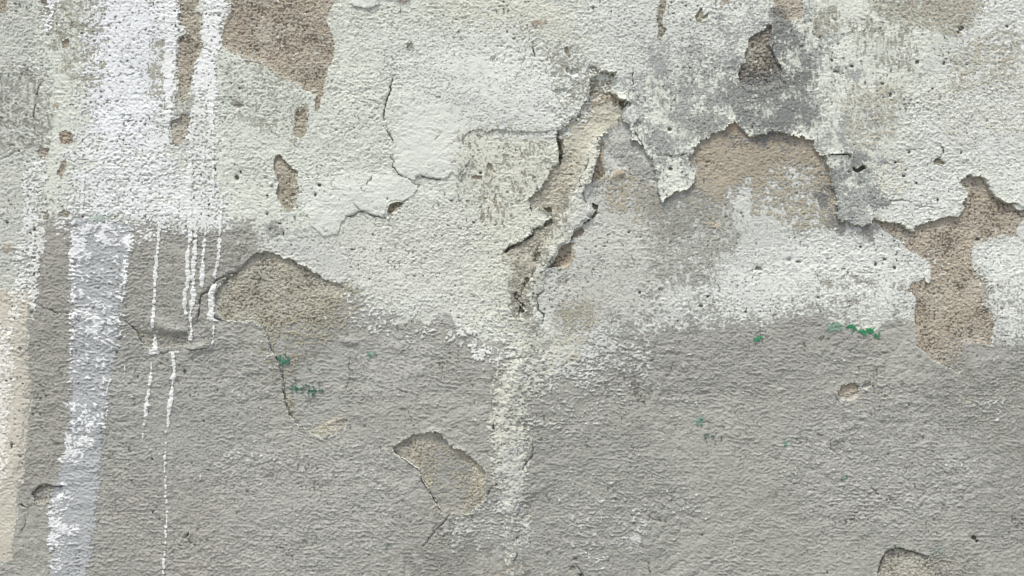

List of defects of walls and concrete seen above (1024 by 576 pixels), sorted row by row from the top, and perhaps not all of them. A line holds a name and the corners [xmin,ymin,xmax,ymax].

flaking render [219,0,335,138]
peeling [738,0,803,94]
crack [305,6,725,439]
flaking render [274,42,1024,373]
peeling [215,251,362,442]
flaking render [837,381,871,404]
peeling [393,431,490,524]
peeling [877,548,957,576]